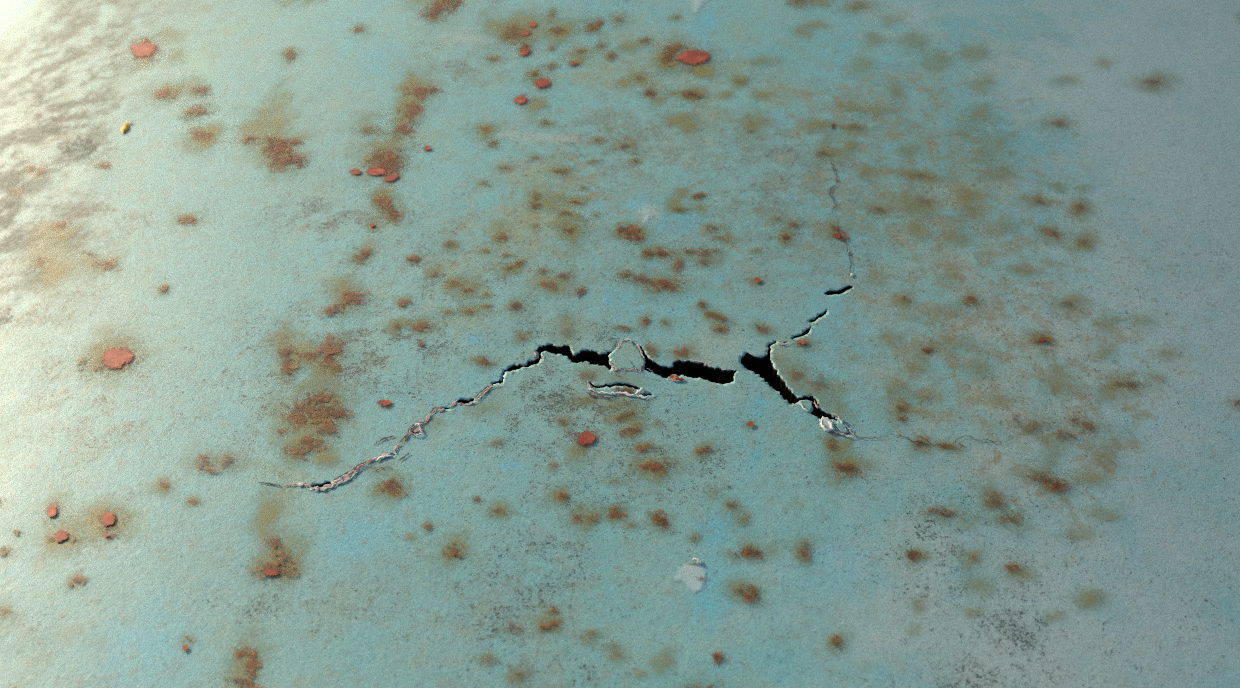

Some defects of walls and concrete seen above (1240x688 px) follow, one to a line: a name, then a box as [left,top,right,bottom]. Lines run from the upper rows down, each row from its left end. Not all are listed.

corrosion [240,94,309,172]
corrosion [349,74,443,225]
crack [259,123,1007,492]
corrosion [271,279,370,464]
corrosion [43,502,132,553]
peeling [674,558,705,591]
corrosion [223,646,265,688]